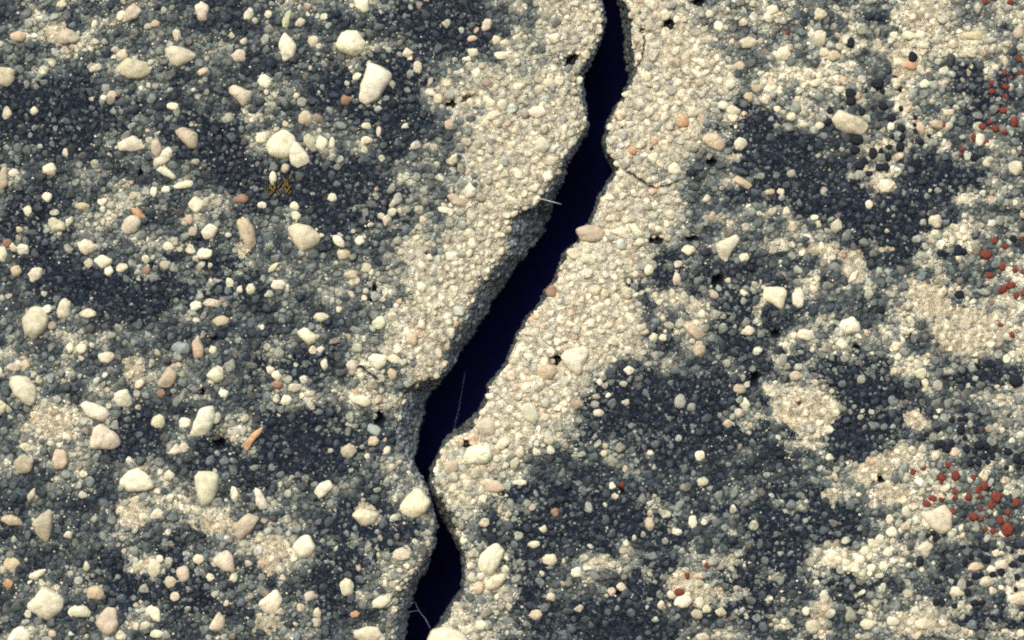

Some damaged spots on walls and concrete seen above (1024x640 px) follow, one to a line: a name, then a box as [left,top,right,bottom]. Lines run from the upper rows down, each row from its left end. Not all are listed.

crack [332,0,680,640]